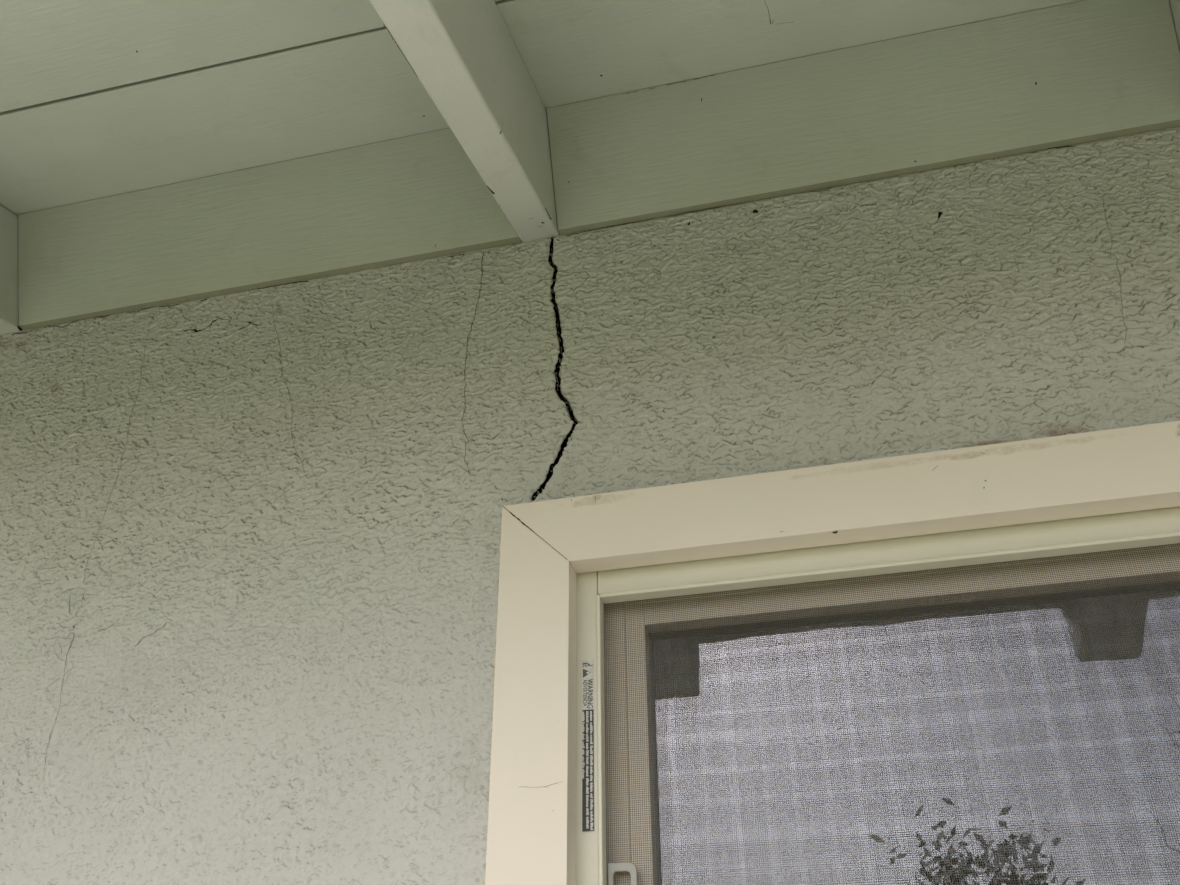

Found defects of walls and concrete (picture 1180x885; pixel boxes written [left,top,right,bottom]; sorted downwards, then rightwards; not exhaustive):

crack [462,251,484,473]
crack [513,208,589,501]